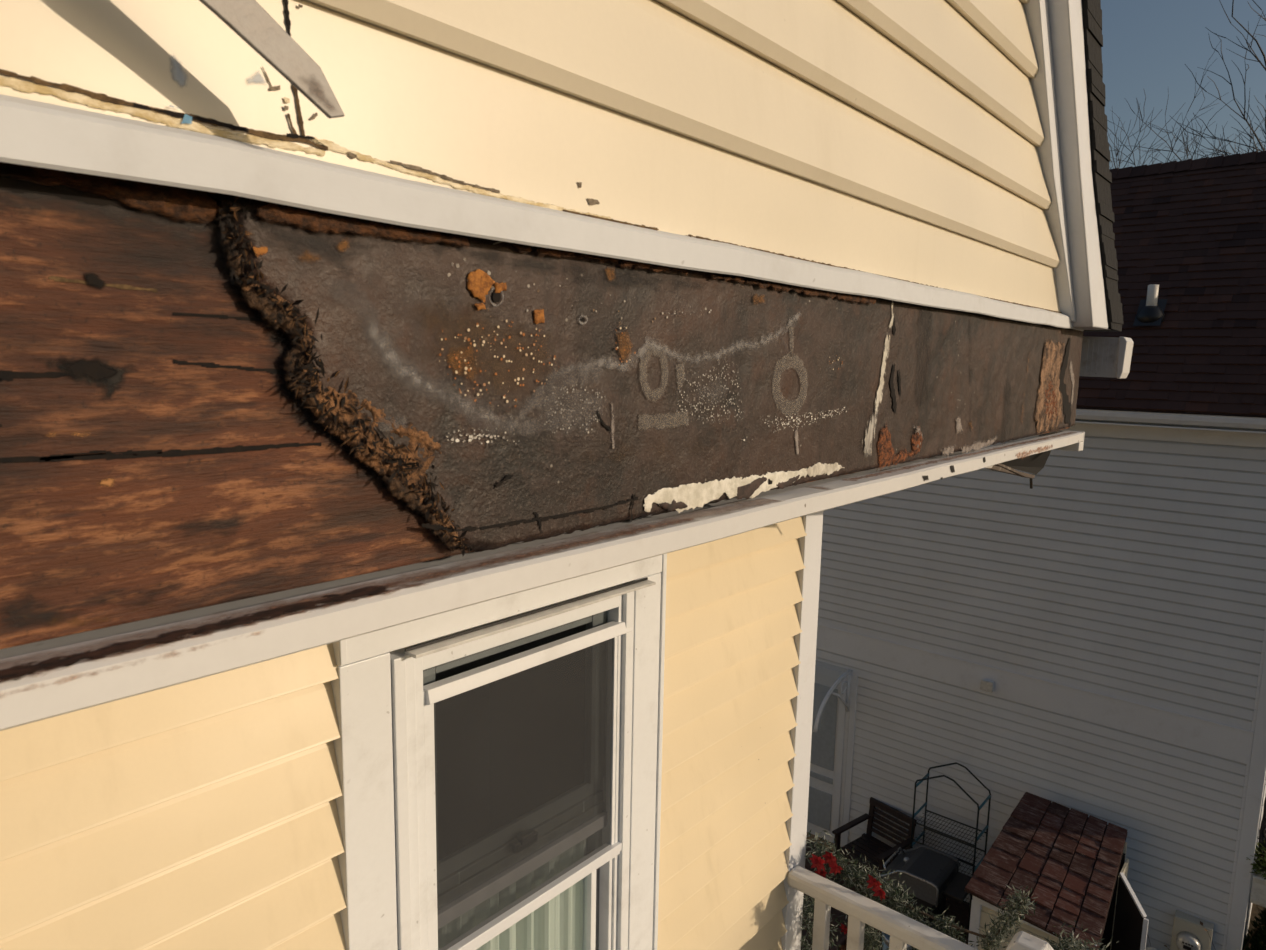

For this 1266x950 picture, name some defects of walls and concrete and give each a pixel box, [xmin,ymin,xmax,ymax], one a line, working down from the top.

corrosion [439,269,557,407]
crack [0,370,71,382]
peeling [215,193,474,556]
crack [0,442,321,463]
corrosion [850,432,1076,481]
peeling [643,462,845,513]